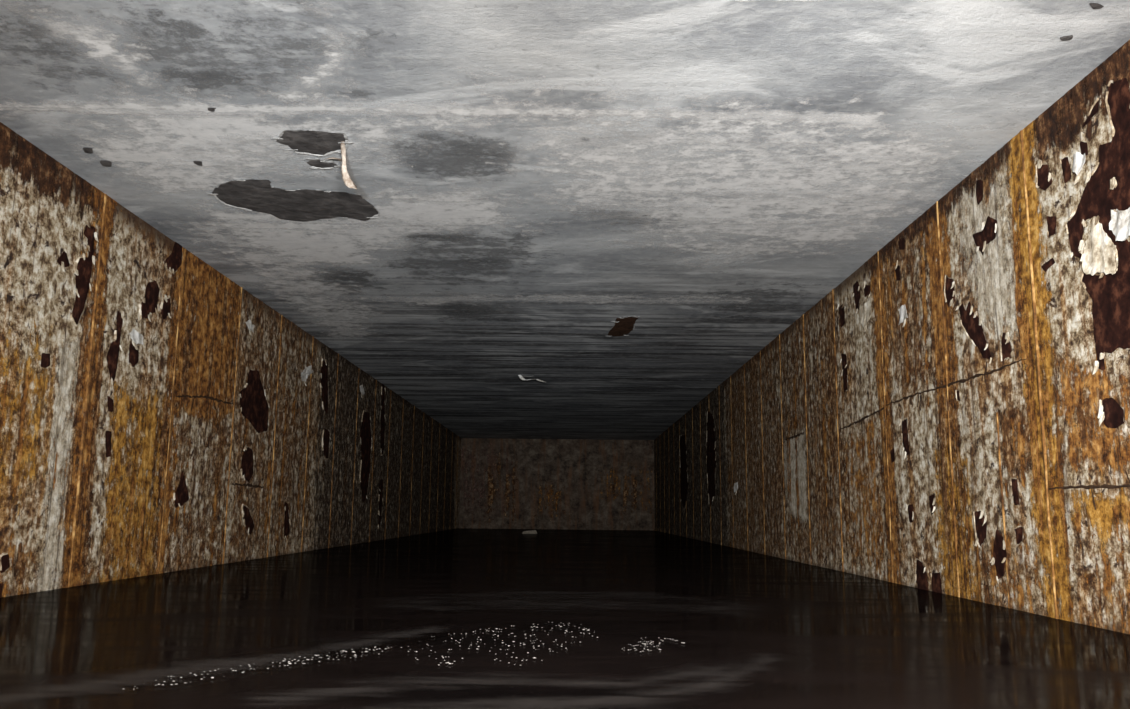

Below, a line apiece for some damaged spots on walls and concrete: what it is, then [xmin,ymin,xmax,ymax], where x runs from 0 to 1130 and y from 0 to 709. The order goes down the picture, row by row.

peeling [57,220,99,327]
peeling [106,279,171,412]
rust [0,122,456,597]
peeling [239,369,270,435]
damp [0,4,1018,343]
rust [654,40,1130,634]
crack [841,359,1026,429]
peeling [944,275,1014,364]
peeling [972,216,997,255]
peeling [1036,78,1130,375]
peeling [1097,398,1125,428]
crack [1049,471,1130,510]